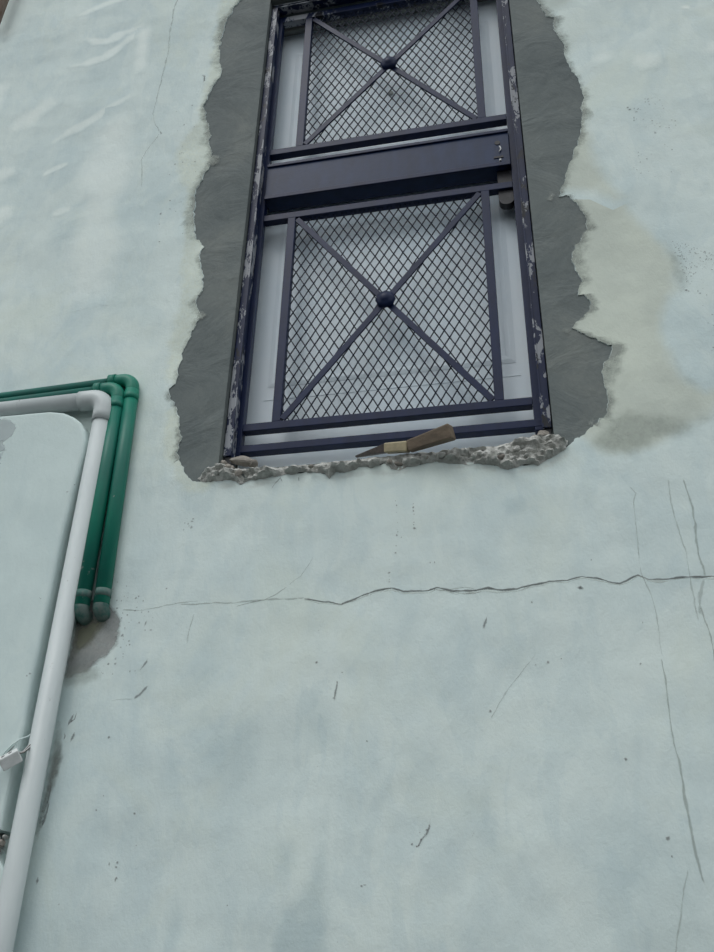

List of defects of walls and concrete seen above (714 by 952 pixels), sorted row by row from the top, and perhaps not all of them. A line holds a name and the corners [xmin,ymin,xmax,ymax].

water stain [550,81,714,465]
water stain [158,402,221,497]
spalling [198,434,568,484]
crack [307,575,714,605]